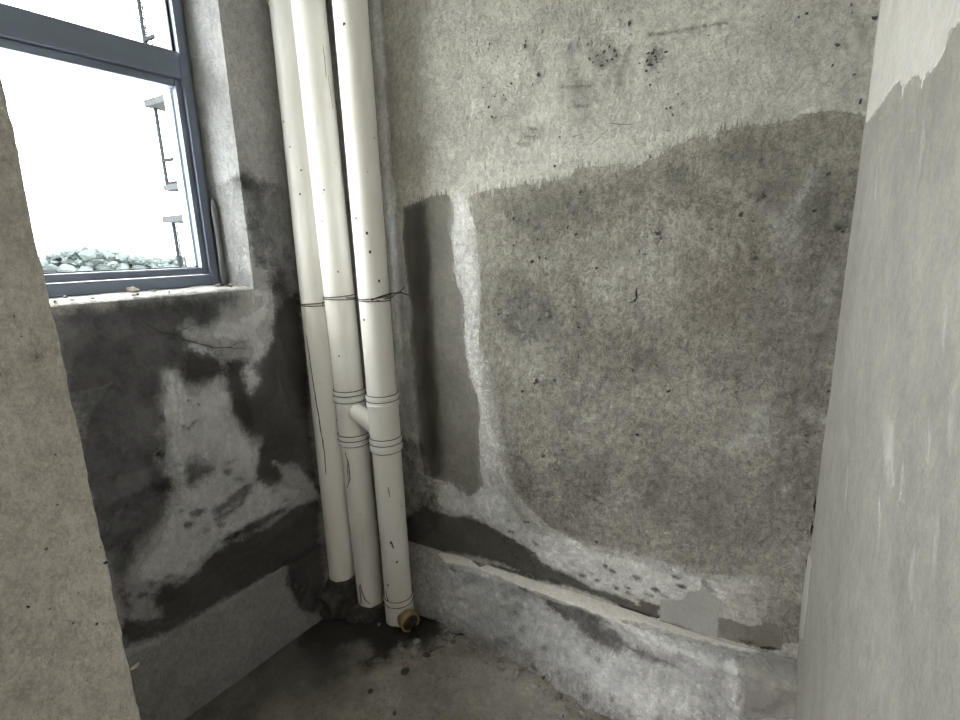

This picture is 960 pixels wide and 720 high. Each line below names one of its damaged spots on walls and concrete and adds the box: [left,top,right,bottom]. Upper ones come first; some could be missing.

crack [147,324,247,349]
leakage [239,177,259,191]
leakage [57,269,444,667]
leakage [395,22,960,720]